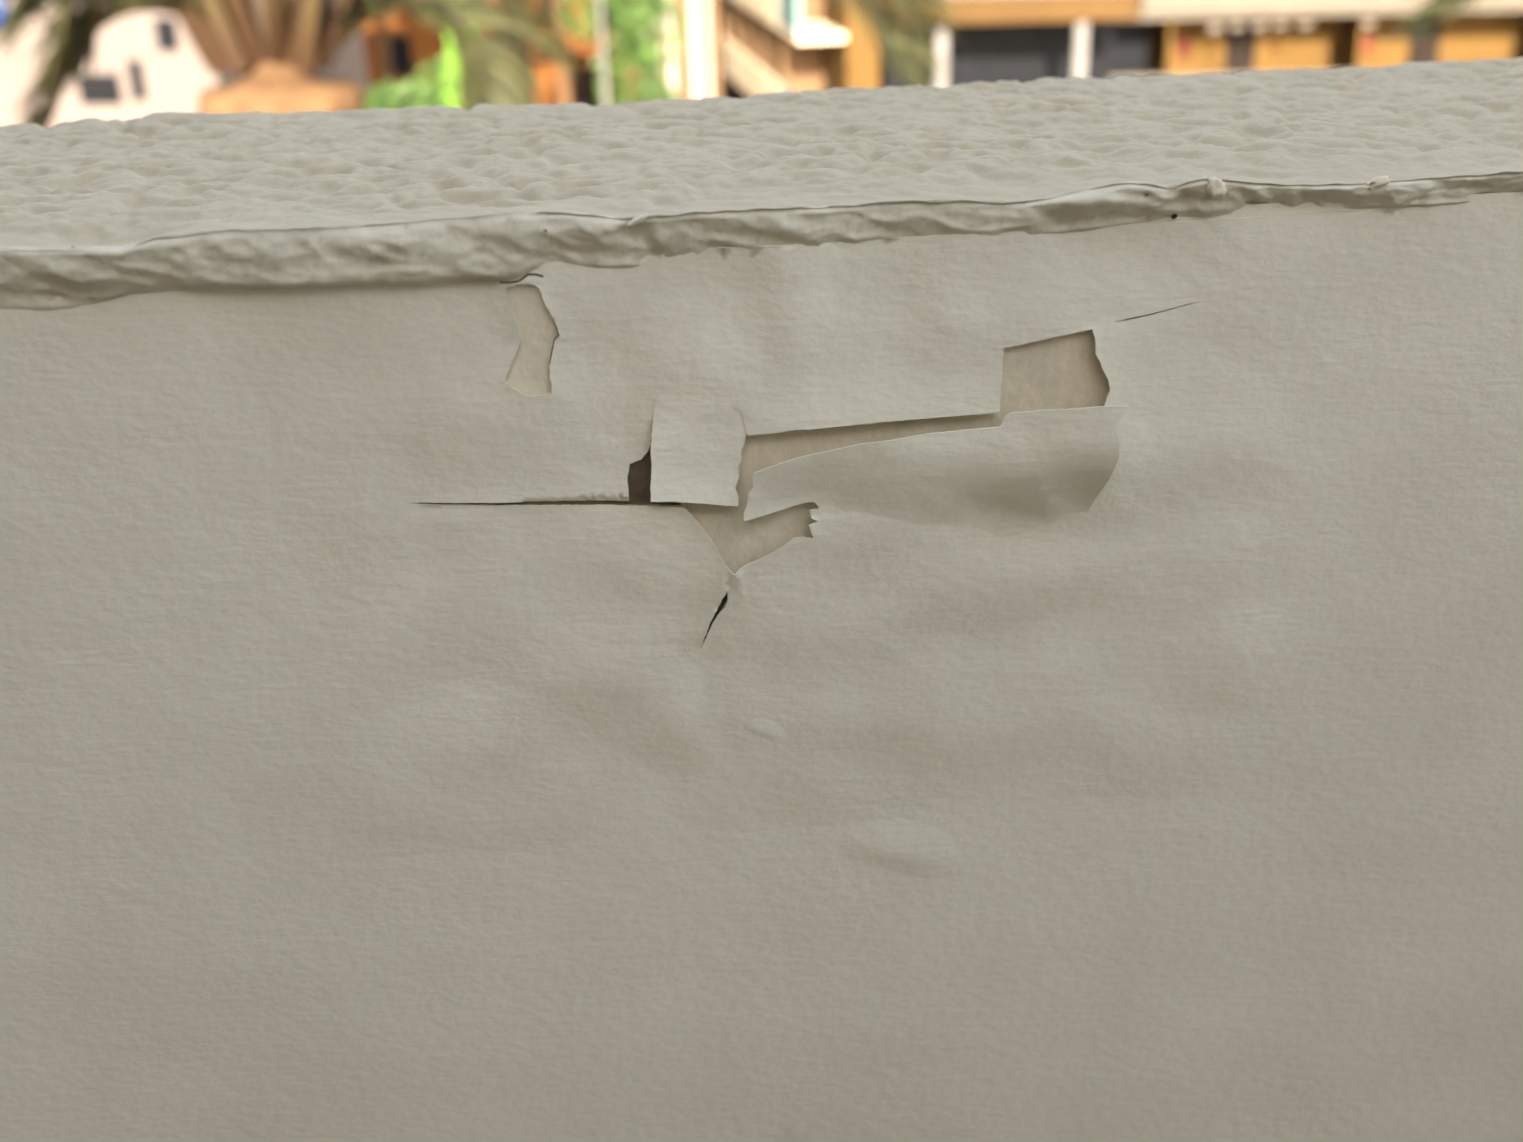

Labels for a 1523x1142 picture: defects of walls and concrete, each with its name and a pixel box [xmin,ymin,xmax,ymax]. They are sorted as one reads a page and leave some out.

spalling [506,284,559,396]
peeling [612,329,1128,574]